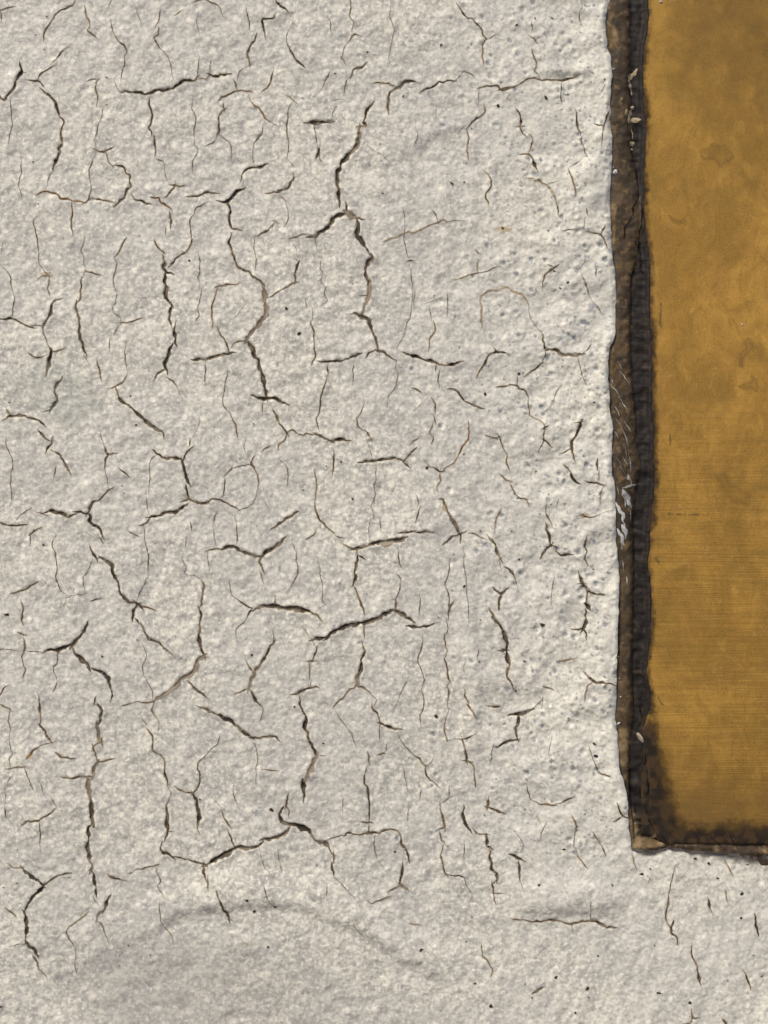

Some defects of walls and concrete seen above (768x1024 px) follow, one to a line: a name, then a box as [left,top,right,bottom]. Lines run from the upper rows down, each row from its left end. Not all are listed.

crack [0,0,645,974]
crack [707,833,757,915]